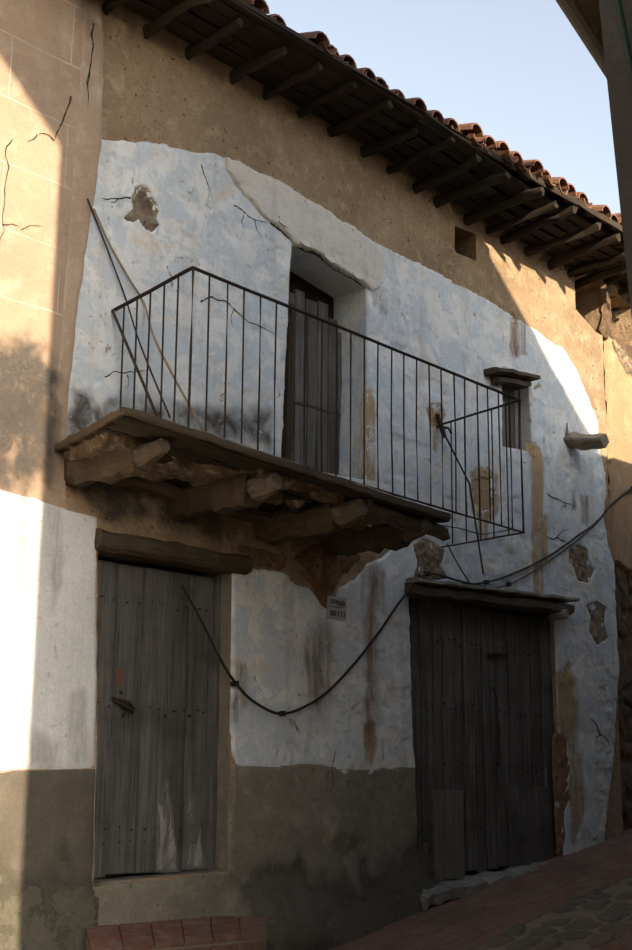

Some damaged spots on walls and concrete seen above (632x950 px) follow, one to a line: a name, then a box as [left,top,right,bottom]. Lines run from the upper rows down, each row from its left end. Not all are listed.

crack [0,23,95,239]
flaking render [124,185,159,232]
flaking render [413,539,446,580]
flaking render [569,545,594,583]
flaking render [587,602,608,645]
water stain [555,666,584,840]
flaking render [552,731,571,855]